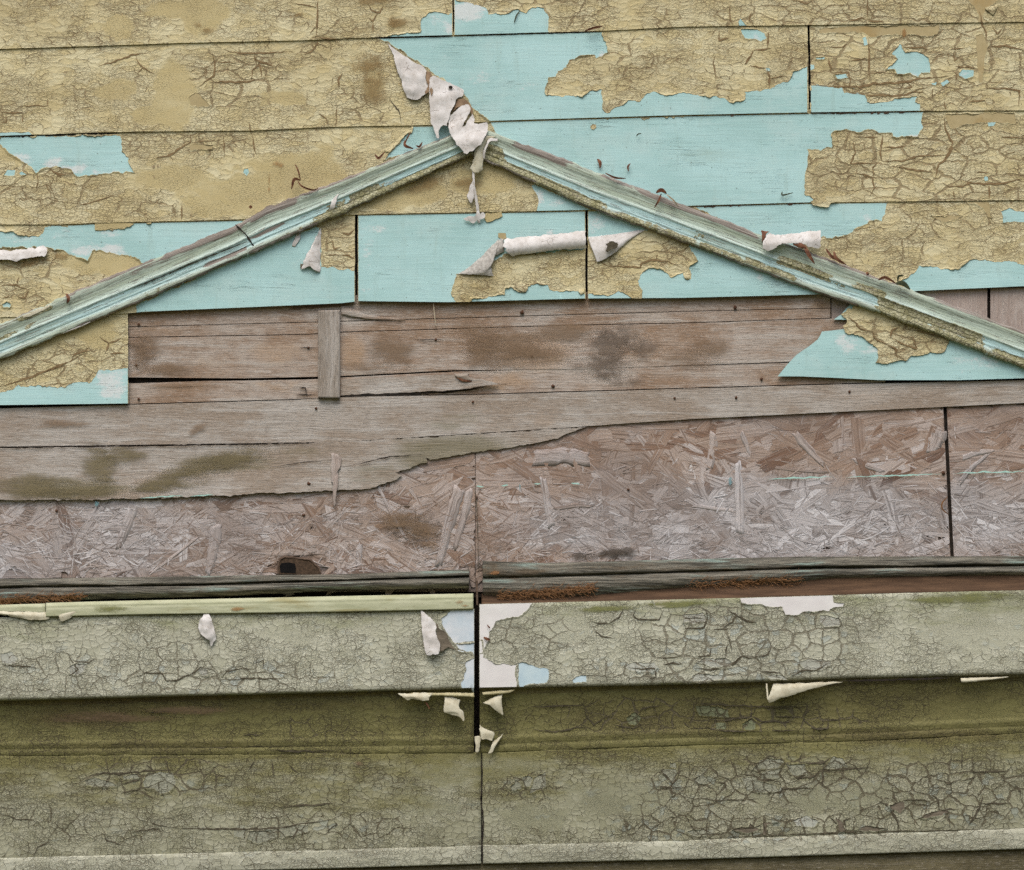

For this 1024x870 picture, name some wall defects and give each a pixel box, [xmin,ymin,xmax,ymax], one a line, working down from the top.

crack [200,2,339,86]
peeling [378,0,924,248]
peeling [0,219,246,264]
peeling [135,184,819,313]
peeling [899,257,1024,291]
peeling [0,367,128,405]
crack [118,660,281,681]
peeling [421,603,551,697]
crack [595,608,828,680]
crack [103,802,338,845]
crack [478,752,486,862]
crack [658,703,1021,839]